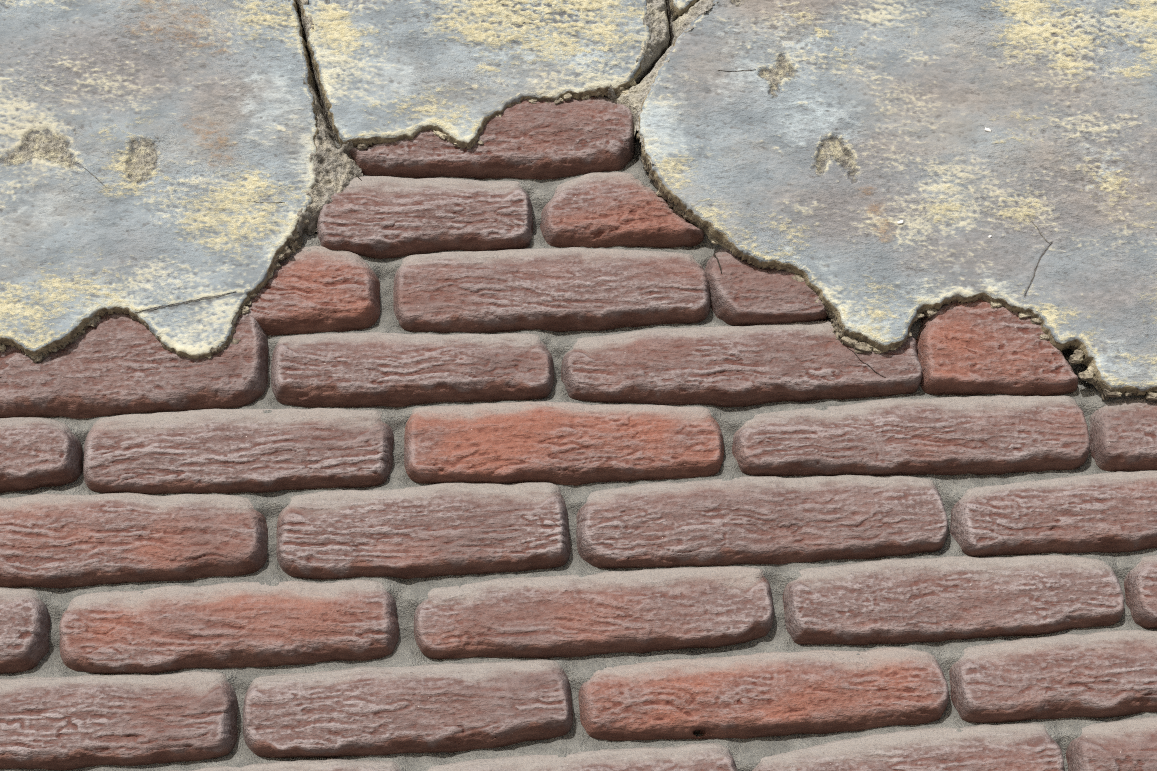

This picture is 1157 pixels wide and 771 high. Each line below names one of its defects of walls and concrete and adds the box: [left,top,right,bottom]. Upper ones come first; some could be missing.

spalling [0,133,75,167]
spalling [125,137,158,182]
crack [235,0,363,236]
spalling [495,79,637,118]
crack [608,0,718,166]
spalling [640,157,804,282]
spalling [206,202,310,359]
crack [1025,222,1052,295]
spalling [23,311,107,363]
spalling [815,298,945,354]
spalling [960,295,1157,401]